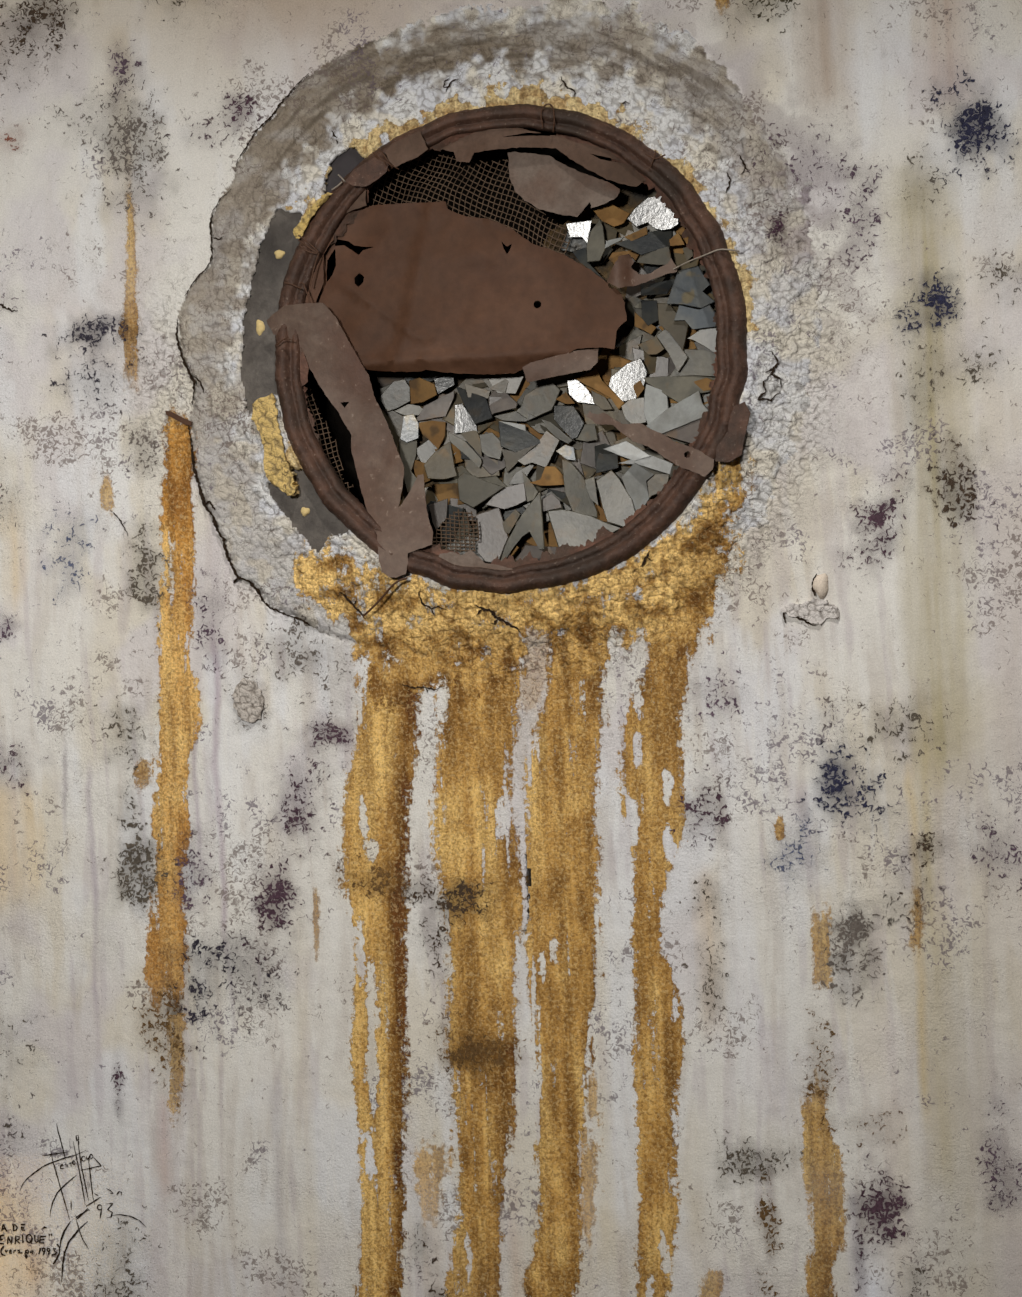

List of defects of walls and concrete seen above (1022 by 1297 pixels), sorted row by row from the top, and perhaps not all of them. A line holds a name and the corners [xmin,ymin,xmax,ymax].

damp [1,39,188,240]
peeling [293,192,332,239]
corrosion [316,201,664,410]
corrosion [348,70,759,332]
damp [837,267,1013,575]
damp [902,64,1018,203]
corrosion [133,407,203,1113]
damp [120,507,495,1114]
corrosion [293,457,756,1297]
damp [764,696,948,889]
corrosion [800,1078,847,1297]
damp [795,1009,930,1297]